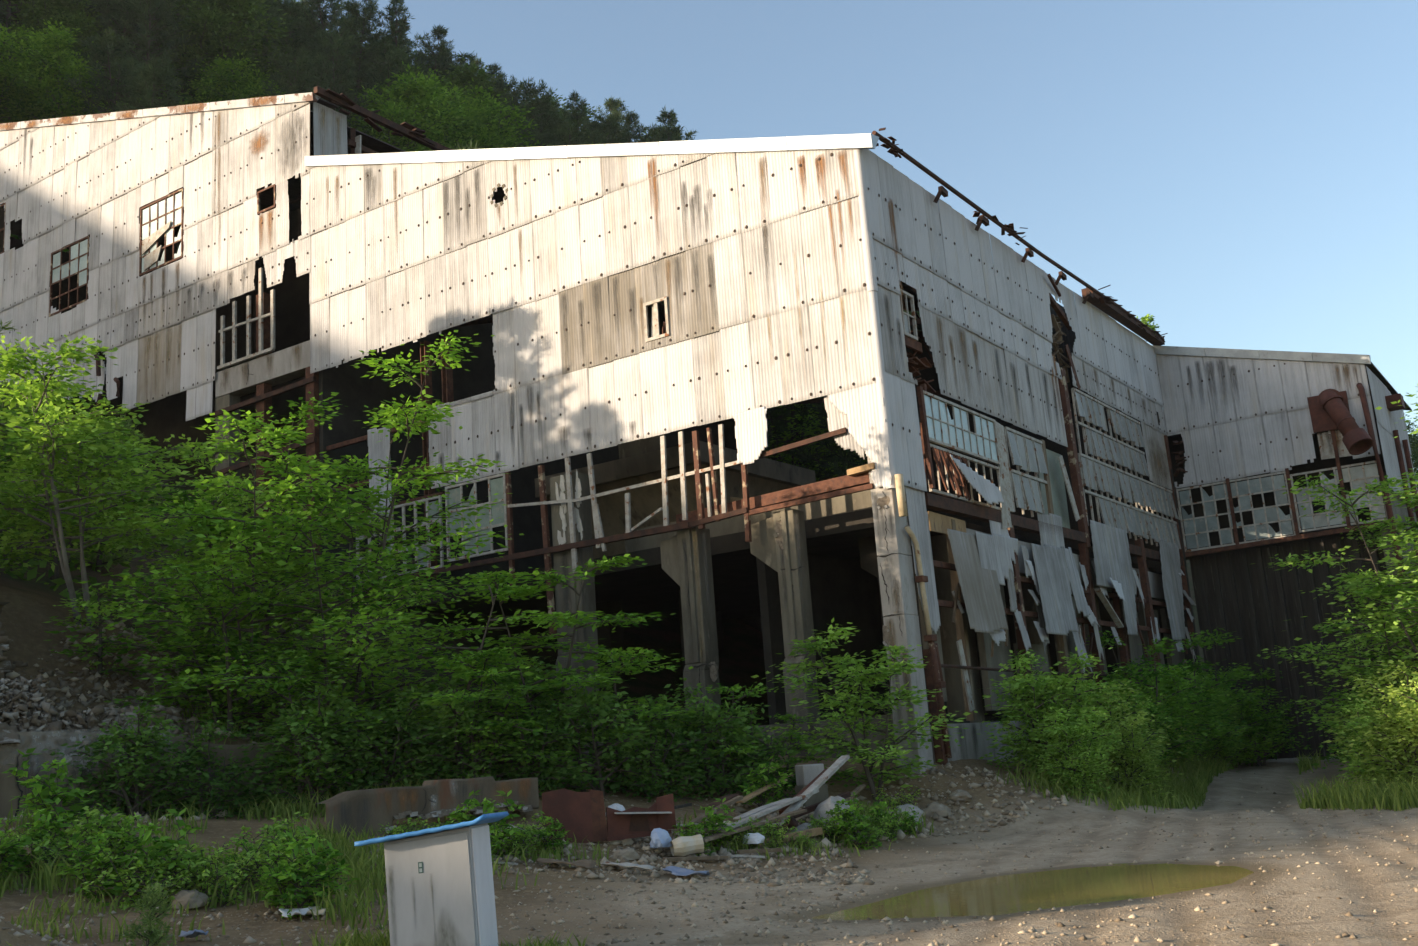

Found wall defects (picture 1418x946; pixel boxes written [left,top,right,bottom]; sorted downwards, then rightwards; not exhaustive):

rust [648,160,658,215]
rust [798,154,847,185]
rust [829,192,851,255]
rust [888,203,898,254]
water stain [676,254,713,291]
water stain [562,280,635,321]
water stain [1187,361,1236,384]